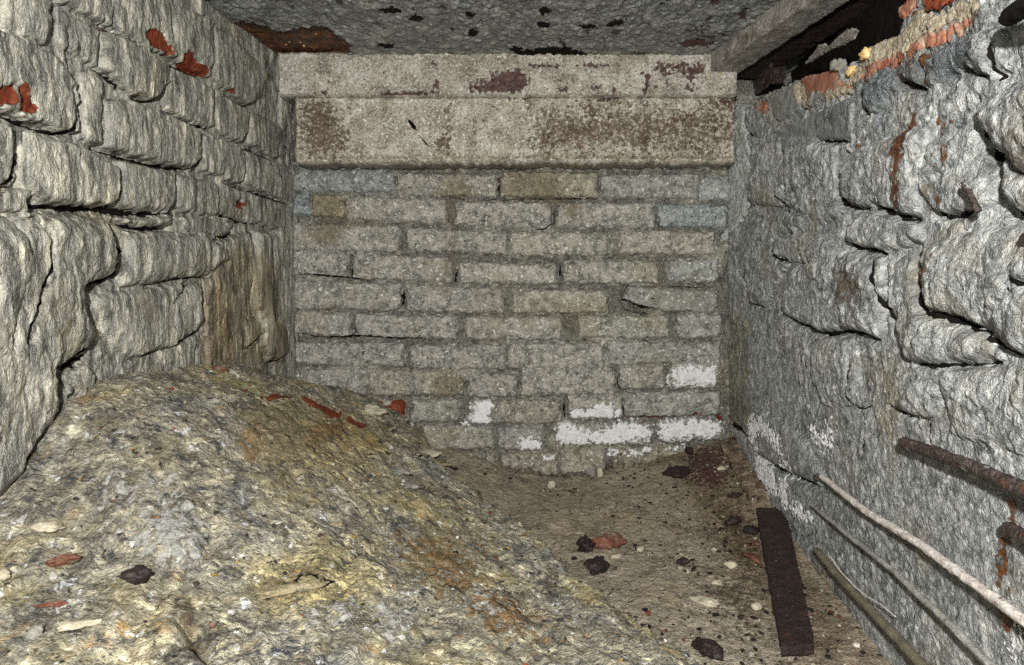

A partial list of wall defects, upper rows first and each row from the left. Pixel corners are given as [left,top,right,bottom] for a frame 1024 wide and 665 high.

spalling [146,28,209,77]
corrosion [233,20,353,56]
spalling [0,82,38,114]
corrosion [468,60,736,161]
corrosion [888,112,916,215]
crack [620,298,655,314]
leakage [666,360,719,394]
leakage [460,398,495,432]
leakage [502,402,725,478]
corrosion [1007,498,1016,524]
corrosion [992,536,1015,598]
corrosion [998,612,1014,637]